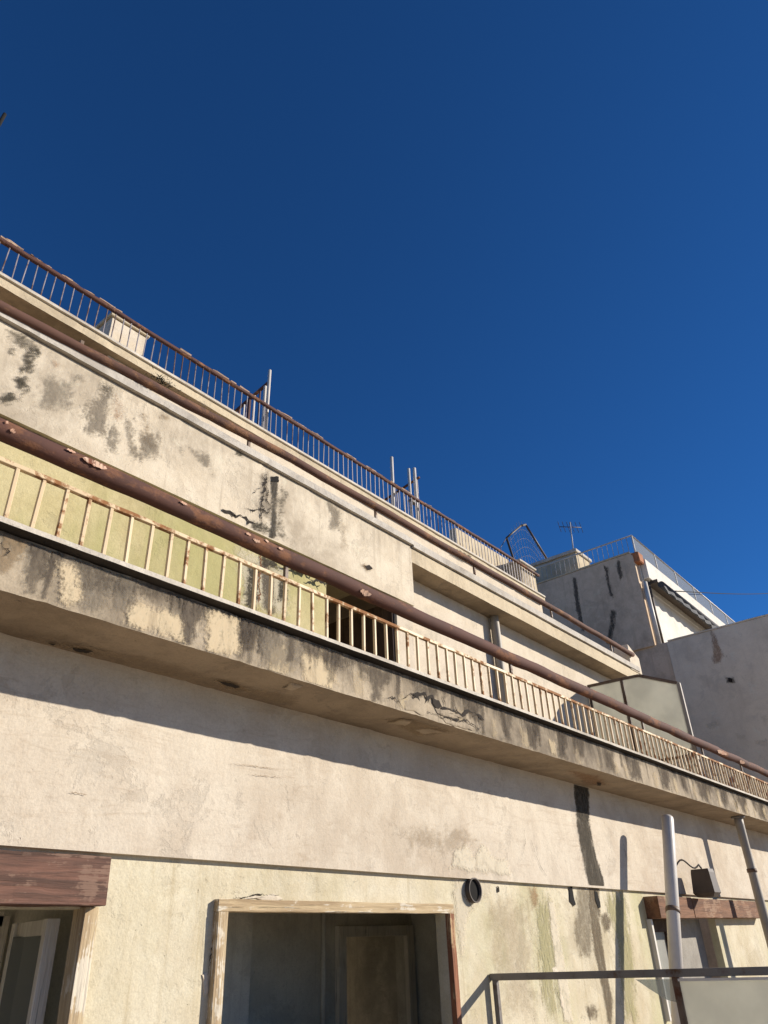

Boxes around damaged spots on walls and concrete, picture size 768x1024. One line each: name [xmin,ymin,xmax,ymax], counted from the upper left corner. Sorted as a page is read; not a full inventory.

water stain [0,331,41,405]
water stain [42,377,159,463]
crack [222,474,271,525]
water stain [0,535,62,599]
water stain [75,559,207,645]
water stain [238,548,288,614]
water stain [573,577,584,631]
water stain [237,621,405,708]
crack [388,692,483,731]
water stain [525,720,584,759]
water stain [659,767,767,819]
water stain [574,785,613,1024]